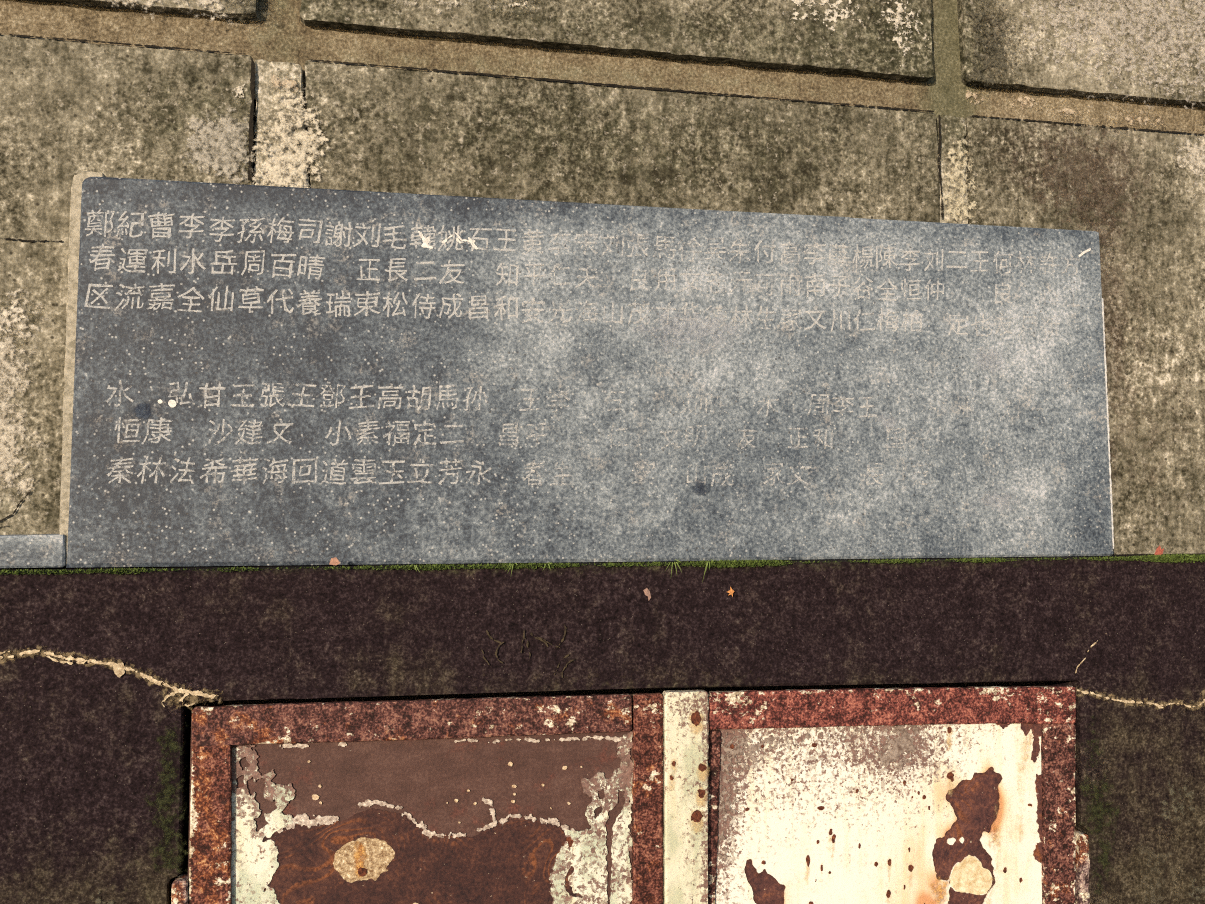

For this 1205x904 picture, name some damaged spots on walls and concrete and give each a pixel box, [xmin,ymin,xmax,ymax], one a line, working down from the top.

crack [0,646,223,707]
crack [1075,640,1205,711]
peeling [231,744,295,904]
corrosion [262,808,576,904]
peeling [549,731,633,904]
corrosion [744,859,786,904]
peeling [717,725,925,862]
corrosion [806,829,836,882]
corrosion [924,767,1023,904]